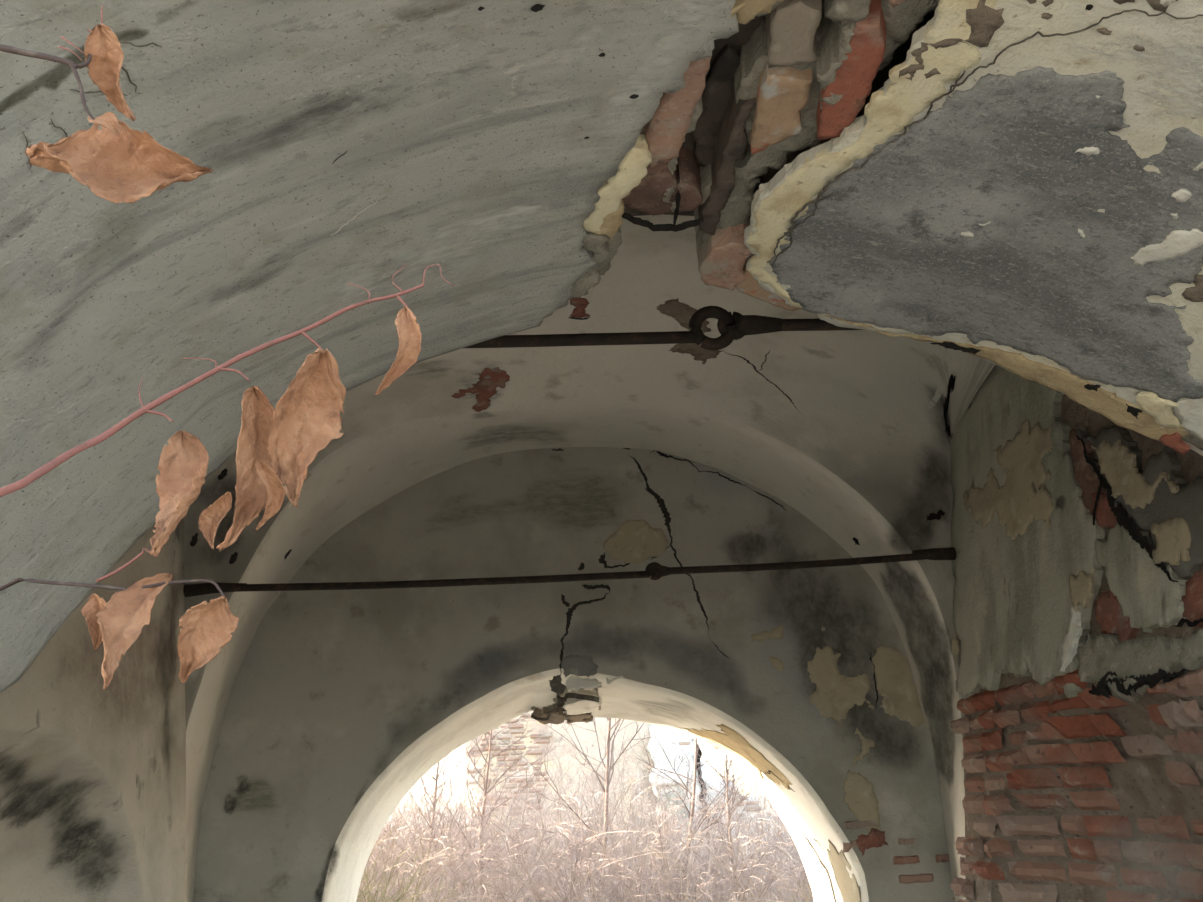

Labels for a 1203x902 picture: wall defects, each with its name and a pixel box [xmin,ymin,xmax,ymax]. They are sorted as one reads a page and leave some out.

crack [70,42,162,96]
flaking render [569,0,1004,320]
crack [767,9,1203,266]
peeling [1130,188,1203,267]
spalling [820,314,1203,509]
water stain [0,759,113,883]
crack [559,448,785,671]
flaking render [679,724,792,790]
water stain [788,582,868,677]
water stain [848,694,912,760]
water stain [884,562,953,780]
flaking render [827,571,1203,902]